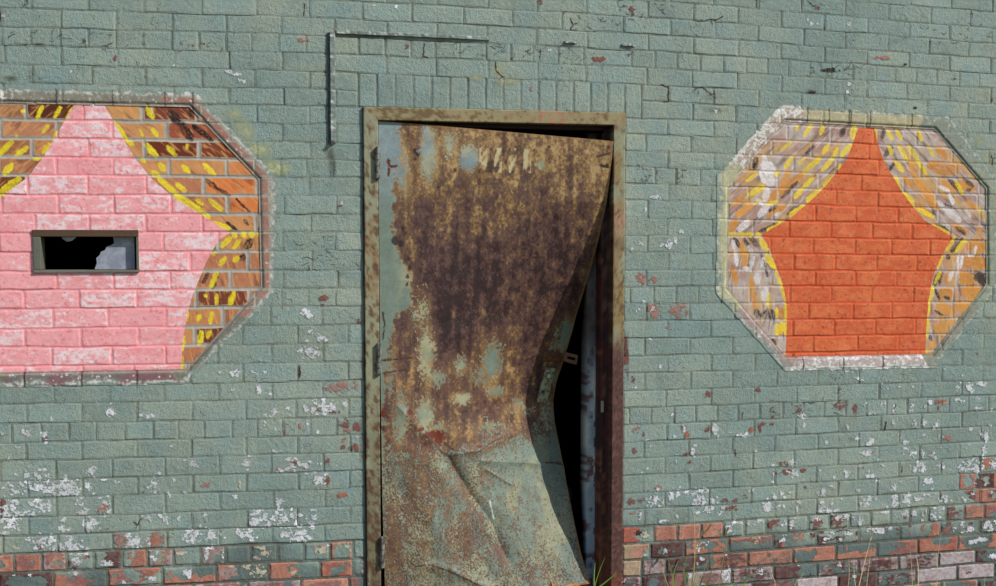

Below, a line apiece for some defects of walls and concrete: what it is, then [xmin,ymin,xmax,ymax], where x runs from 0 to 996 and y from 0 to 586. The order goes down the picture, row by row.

peeling [635,300,688,329]
peeling [21,417,53,445]
peeling [0,459,365,586]
peeling [218,359,272,396]
peeling [263,380,362,487]
peeling [622,374,996,586]